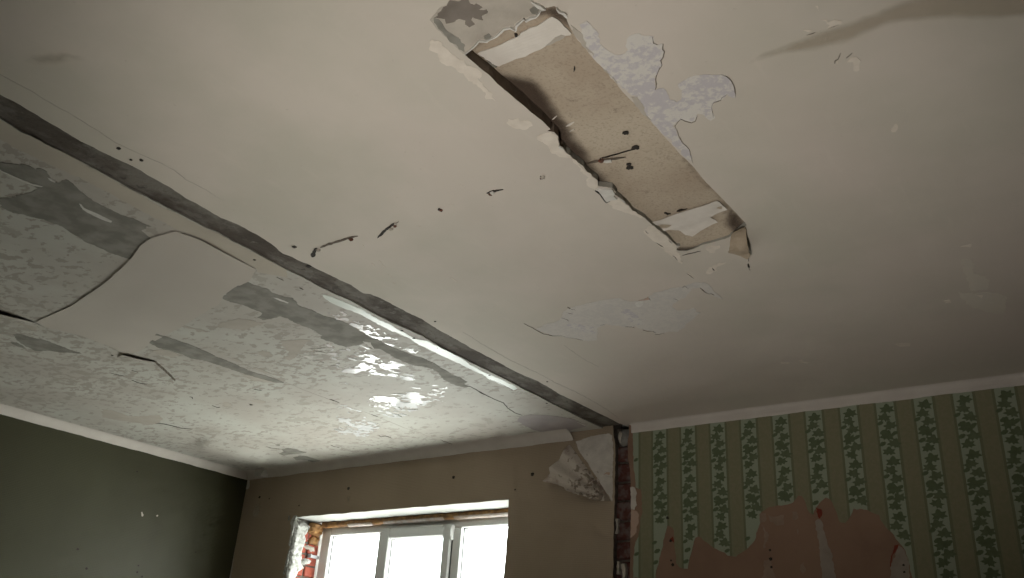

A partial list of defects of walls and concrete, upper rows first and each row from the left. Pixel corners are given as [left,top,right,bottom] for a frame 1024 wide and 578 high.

peeling [430,0,539,54]
peeling [572,21,736,163]
peeling [537,132,720,264]
flaking render [517,414,614,501]